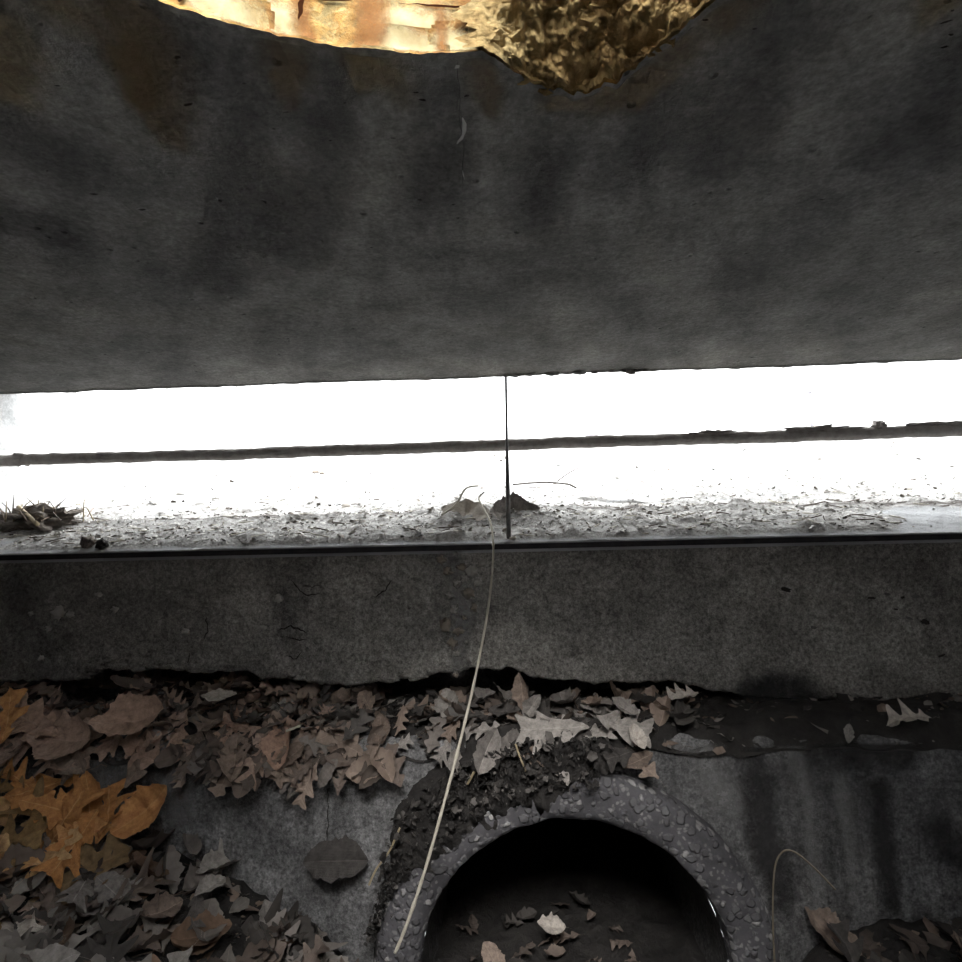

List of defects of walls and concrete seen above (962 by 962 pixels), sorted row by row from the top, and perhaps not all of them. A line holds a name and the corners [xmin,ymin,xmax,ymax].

rust [293,0,315,39]
rust [355,0,386,45]
spalling [451,0,715,96]
damp [697,745,793,912]
damp [871,778,901,914]
damp [926,816,962,871]